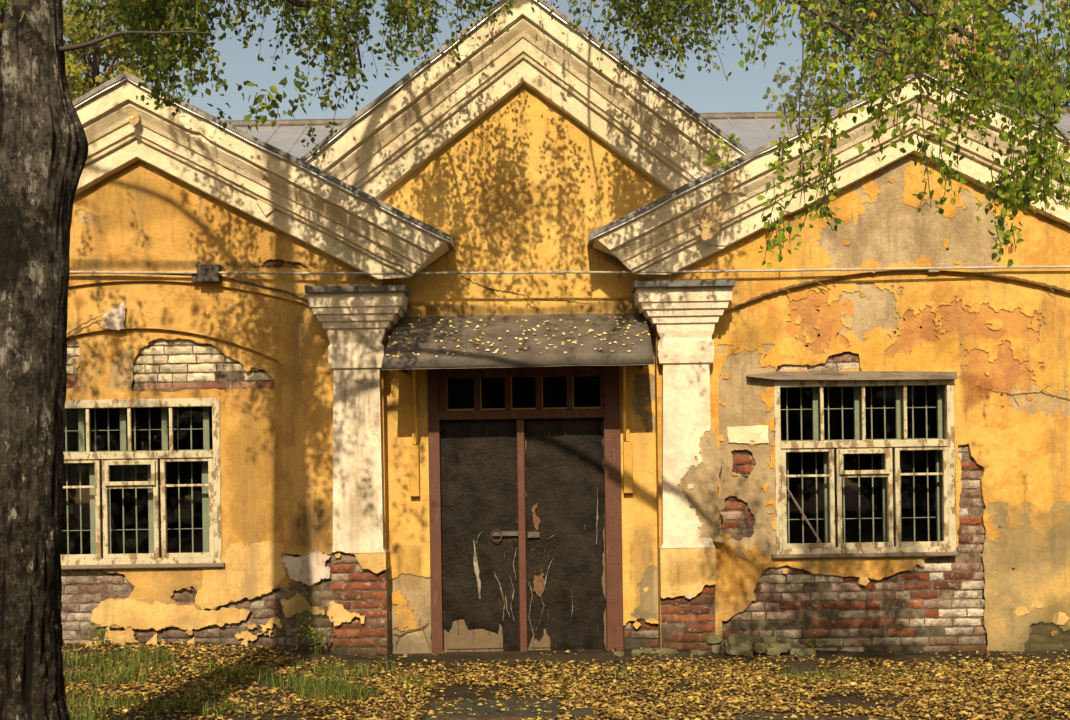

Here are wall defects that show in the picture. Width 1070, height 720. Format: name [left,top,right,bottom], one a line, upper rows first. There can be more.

peeling [102,301,126,330]
crack [458,274,594,309]
spalling [106,339,275,393]
spalling [623,158,1070,653]
crack [973,385,1070,406]
spalling [61,546,432,657]